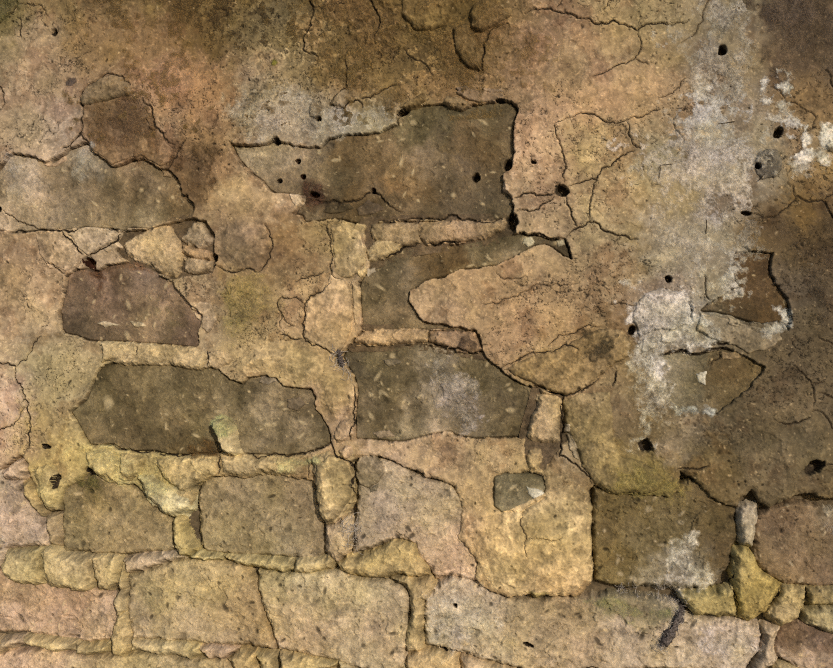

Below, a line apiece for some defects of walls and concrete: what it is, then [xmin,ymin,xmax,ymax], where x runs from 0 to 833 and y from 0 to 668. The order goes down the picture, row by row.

crack [525,0,709,75]
spalling [0,100,217,347]
spalling [72,363,331,455]
crack [277,226,340,357]
spalling [234,85,571,442]
crack [307,78,686,258]
leakage [626,285,720,412]
crack [658,342,732,364]
leakage [675,406,716,416]
spalling [633,245,789,414]
leakage [635,0,833,298]
leakage [763,306,792,336]